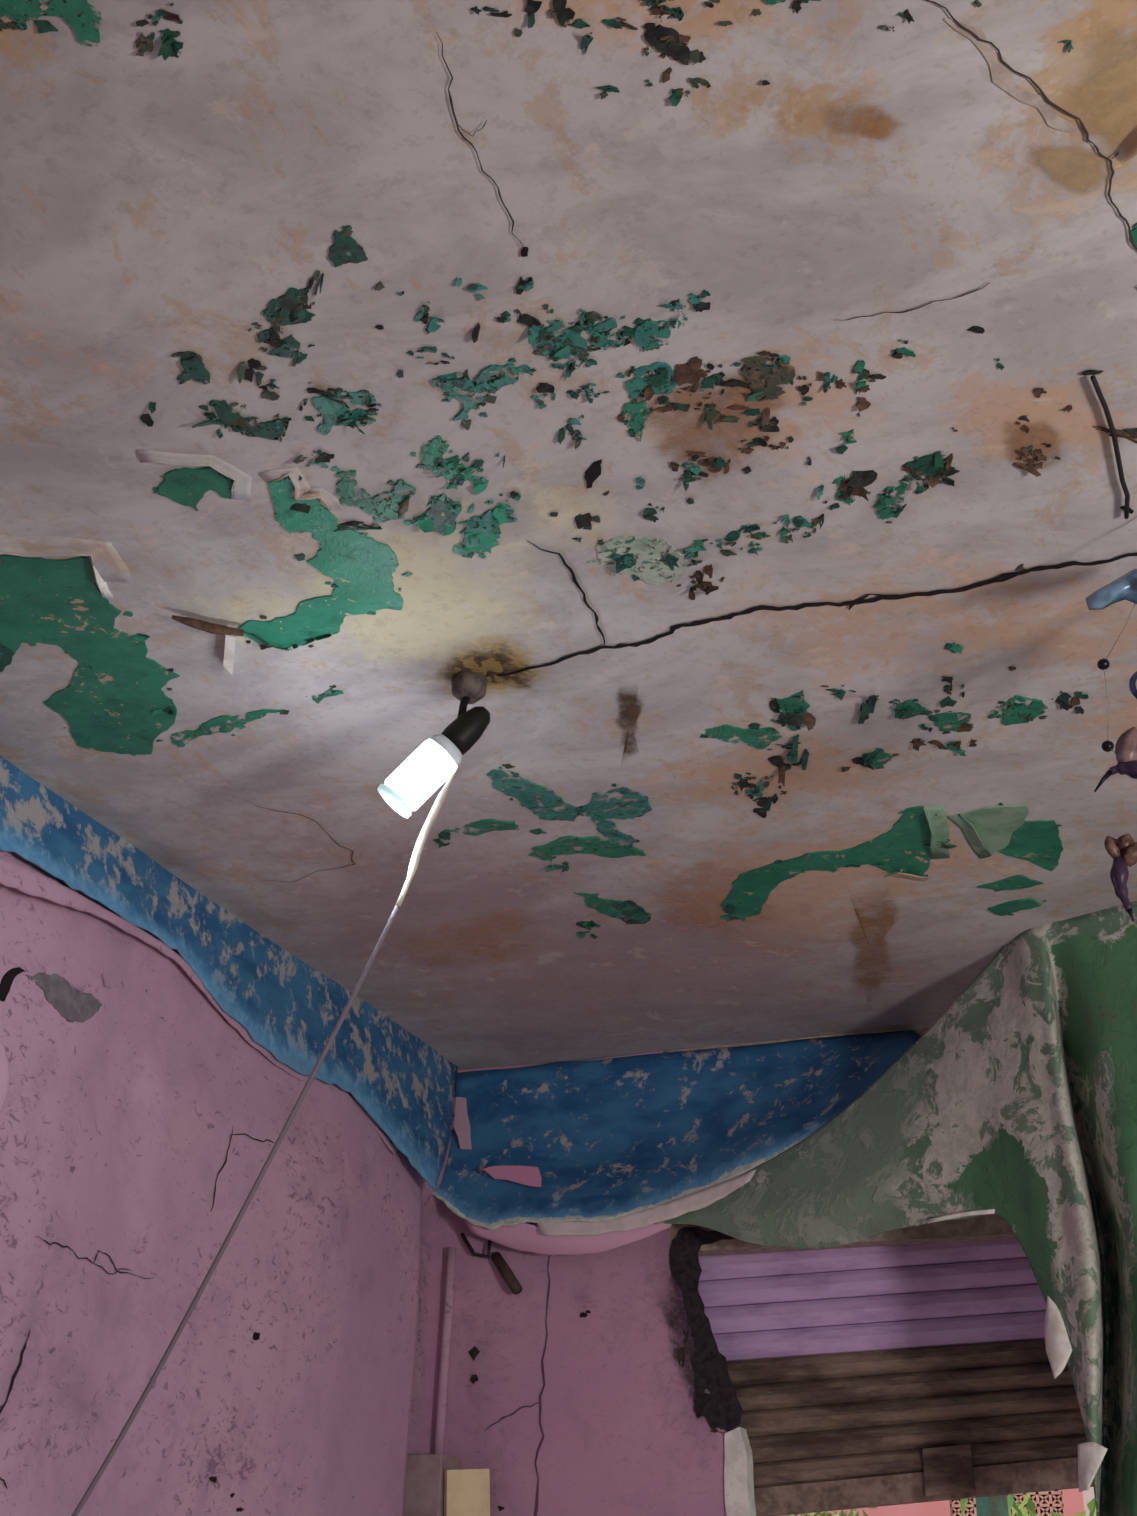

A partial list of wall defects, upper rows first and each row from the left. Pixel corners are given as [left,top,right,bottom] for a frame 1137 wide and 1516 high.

crack [436,32,524,248]
leakage [839,114,894,138]
crack [926,0,1137,250]
leakage [1036,149,1104,191]
leakage [1078,38,1137,143]
peeling [0,535,289,756]
peeling [137,225,521,675]
peeling [397,276,887,505]
peeling [550,451,960,600]
crack [497,540,1137,676]
peeling [0,756,1137,1516]
crack [0,1331,30,1414]